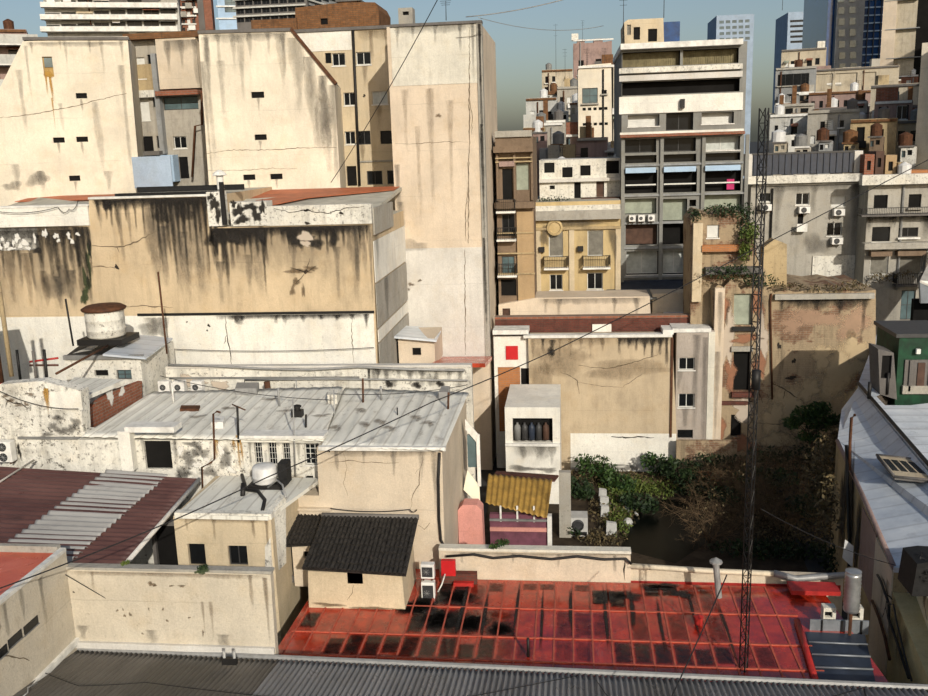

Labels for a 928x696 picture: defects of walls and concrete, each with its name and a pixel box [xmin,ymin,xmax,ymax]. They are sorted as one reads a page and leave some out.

crack [1,93,126,118]
crack [395,29,473,355]
peeling [0,229,80,251]
water stain [95,193,368,274]
spalling [297,221,313,247]
peeling [723,288,769,391]
spalling [782,307,869,362]
water stain [839,454,860,568]
water stain [301,603,341,627]
water stain [324,583,553,658]
water stain [561,583,774,666]